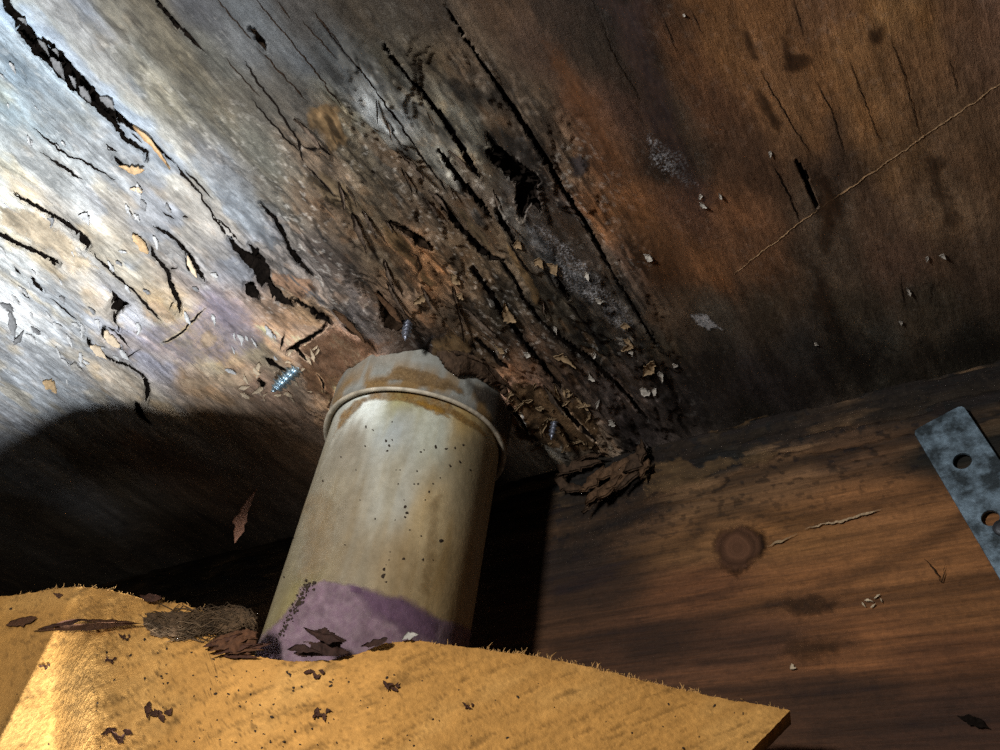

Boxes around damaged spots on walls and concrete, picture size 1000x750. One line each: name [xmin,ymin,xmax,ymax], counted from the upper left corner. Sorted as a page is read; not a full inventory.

peeling [0,269,41,345]
crack [0,233,151,424]
peeling [37,38,115,110]
crack [2,0,237,343]
peeling [183,326,380,402]
peeling [309,174,436,332]
rust [338,367,485,435]
crack [218,0,657,442]
peeling [504,375,615,453]
leakage [532,222,633,331]
crack [761,73,818,221]
crack [816,82,844,153]